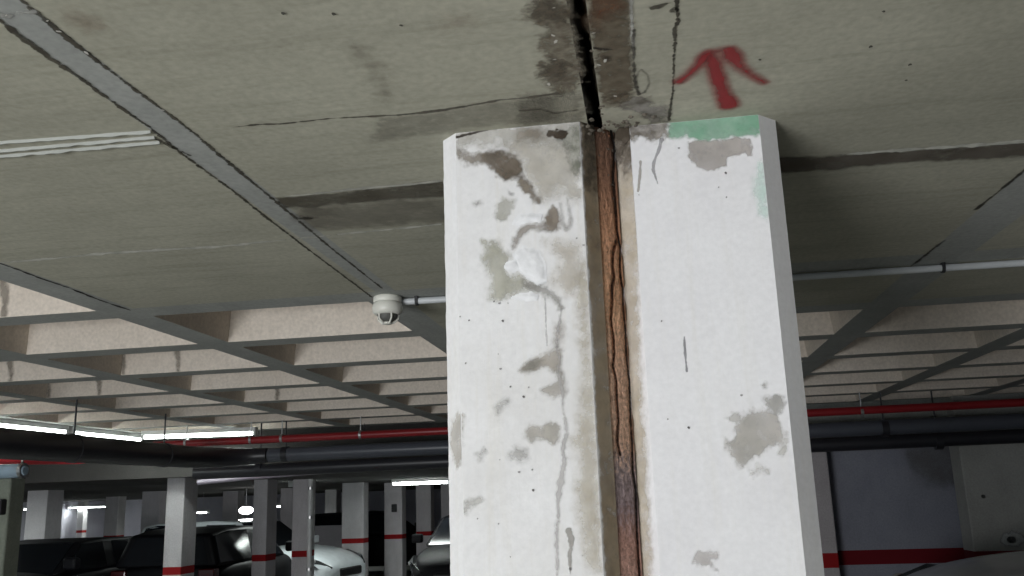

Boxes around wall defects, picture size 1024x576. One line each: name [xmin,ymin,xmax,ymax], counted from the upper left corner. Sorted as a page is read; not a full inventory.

water stain [527,0,584,95]
water stain [631,29,646,95]
crack [238,93,576,127]
crack [610,0,680,576]
water stain [457,122,620,576]
water stain [615,141,651,576]
water stain [728,385,787,474]